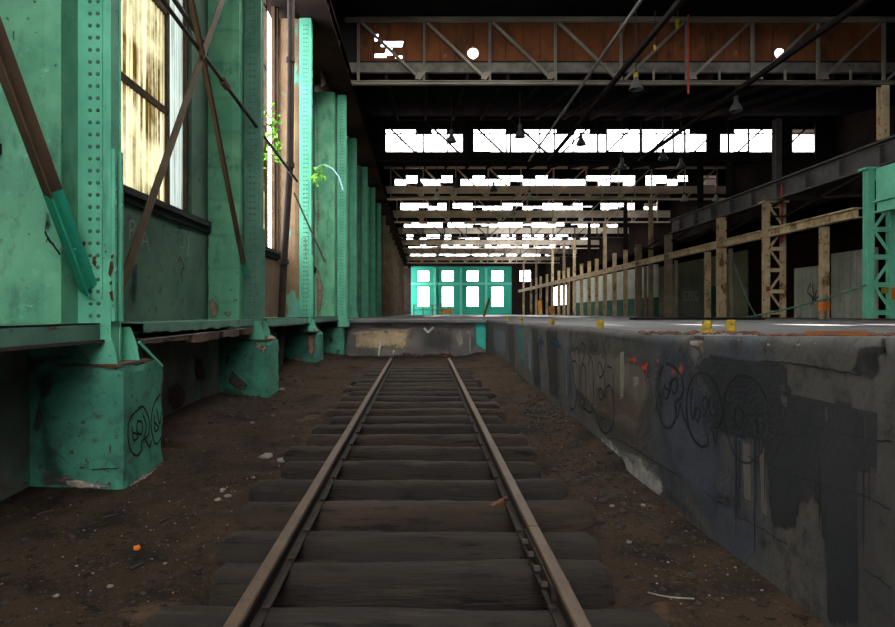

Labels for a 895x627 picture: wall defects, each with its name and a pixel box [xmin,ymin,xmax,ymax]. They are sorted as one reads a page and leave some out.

spalling [45,476,111,488]